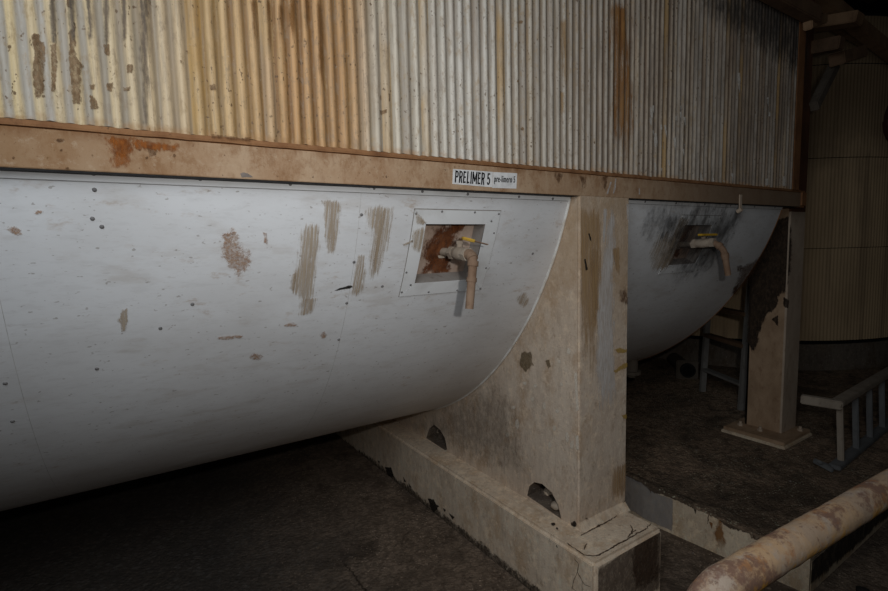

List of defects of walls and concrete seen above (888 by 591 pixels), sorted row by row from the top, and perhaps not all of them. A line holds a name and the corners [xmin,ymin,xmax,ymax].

corrosion [0,117,801,193]
corrosion [422,224,465,274]
crack [567,501,651,591]
corrosion [709,520,725,543]